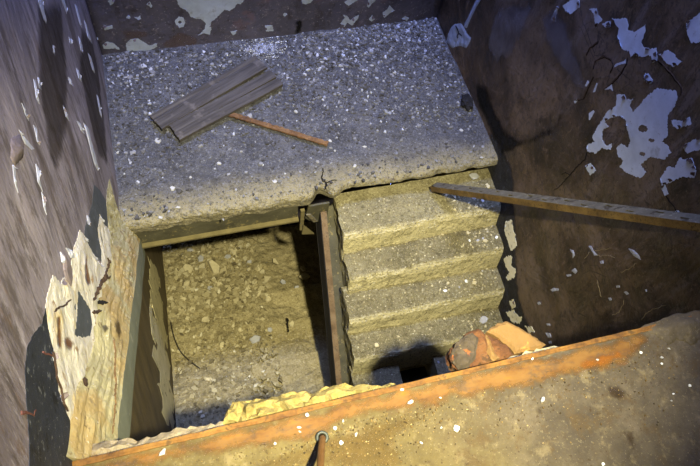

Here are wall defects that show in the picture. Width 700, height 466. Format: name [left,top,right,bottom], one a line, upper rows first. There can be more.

peeling [175,0,244,35]
peeling [340,15,359,27]
peeling [590,8,681,67]
peeling [686,13,700,43]
crack [576,41,628,101]
peeling [19,104,41,150]
peeling [63,106,100,170]
peeling [585,73,700,196]
peeling [36,164,47,215]
flaking render [25,179,121,466]
corrosion [105,336,645,466]